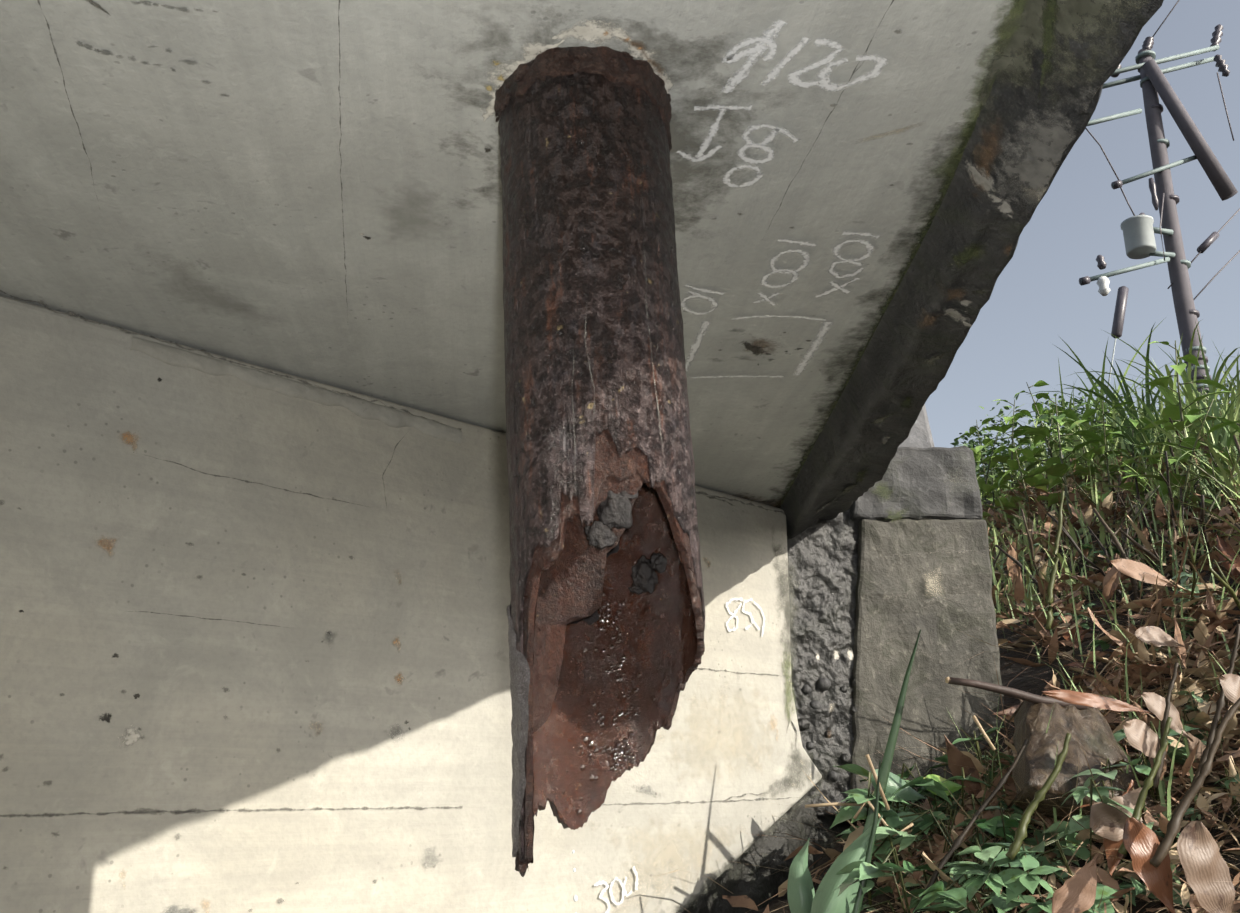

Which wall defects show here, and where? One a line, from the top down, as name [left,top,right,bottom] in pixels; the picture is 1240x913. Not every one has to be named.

crack [87,0,108,13]
leakage [469,21,722,122]
leakage [670,97,735,227]
leakage [743,124,975,512]
peeling [533,471,644,733]